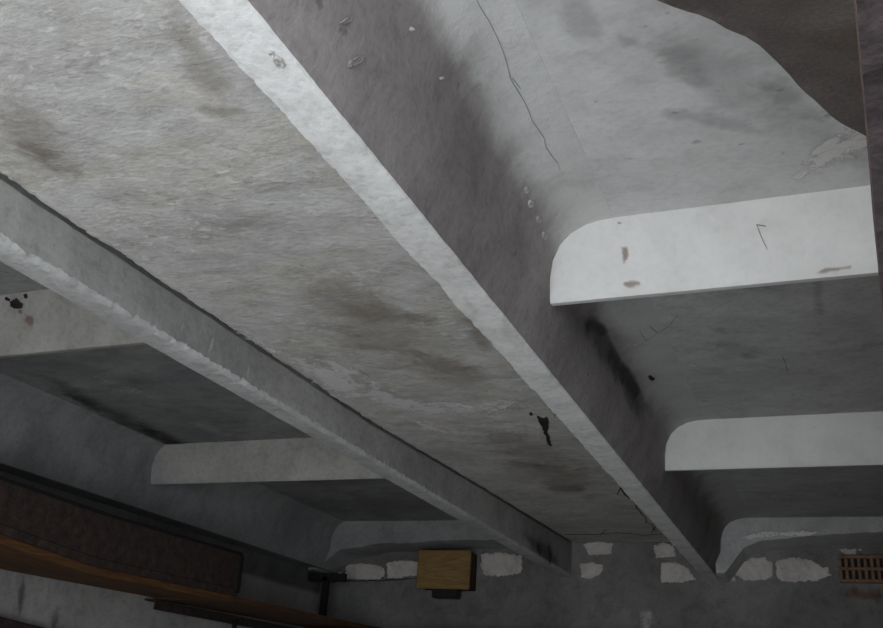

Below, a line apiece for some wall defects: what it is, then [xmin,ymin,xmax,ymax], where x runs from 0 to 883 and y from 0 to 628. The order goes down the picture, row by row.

crack [476,0,560,170]
crack [565,486,659,536]
peeling [339,560,418,580]
peeling [480,552,523,577]
peeling [579,542,613,579]
peeling [654,542,696,583]
peeling [731,557,831,583]